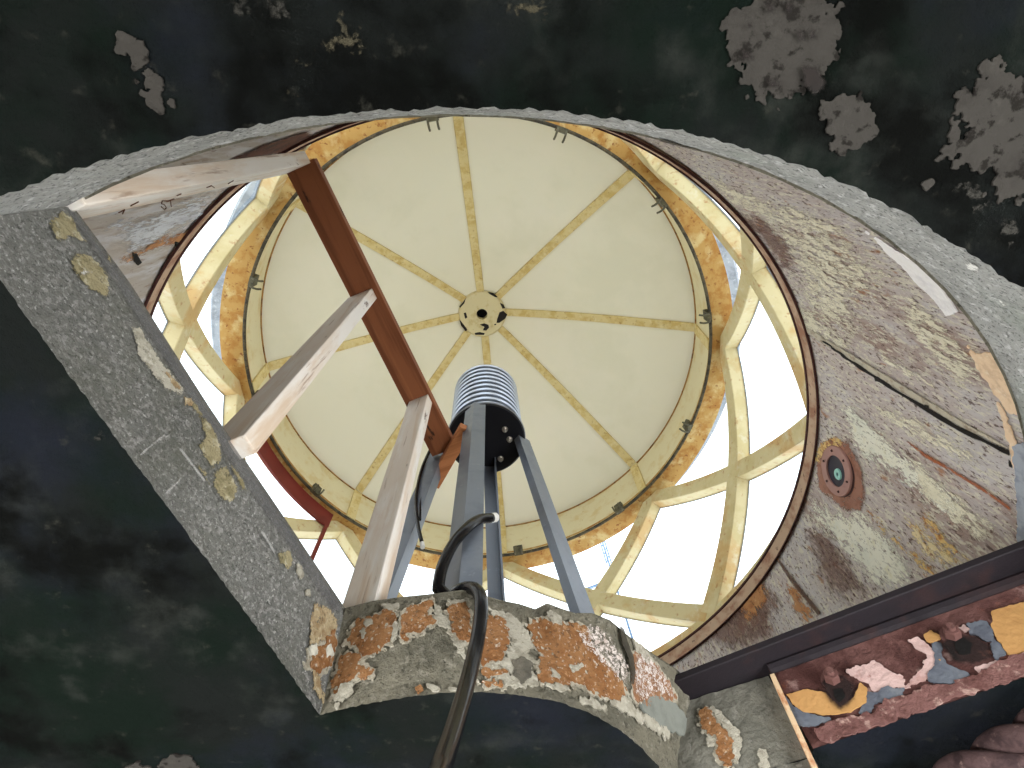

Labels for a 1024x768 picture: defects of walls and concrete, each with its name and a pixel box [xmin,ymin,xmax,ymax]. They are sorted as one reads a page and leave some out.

peeling [114,30,176,115]
peeling [719,0,879,156]
peeling [934,54,1024,213]
spalling [49,211,111,296]
spalling [132,325,246,502]
corrosion [815,433,969,577]
crack [806,327,1013,468]
flaking render [967,345,1024,542]
peeling [278,550,474,710]
peeling [476,606,678,741]
peeling [696,706,743,768]
peeling [785,602,1024,728]